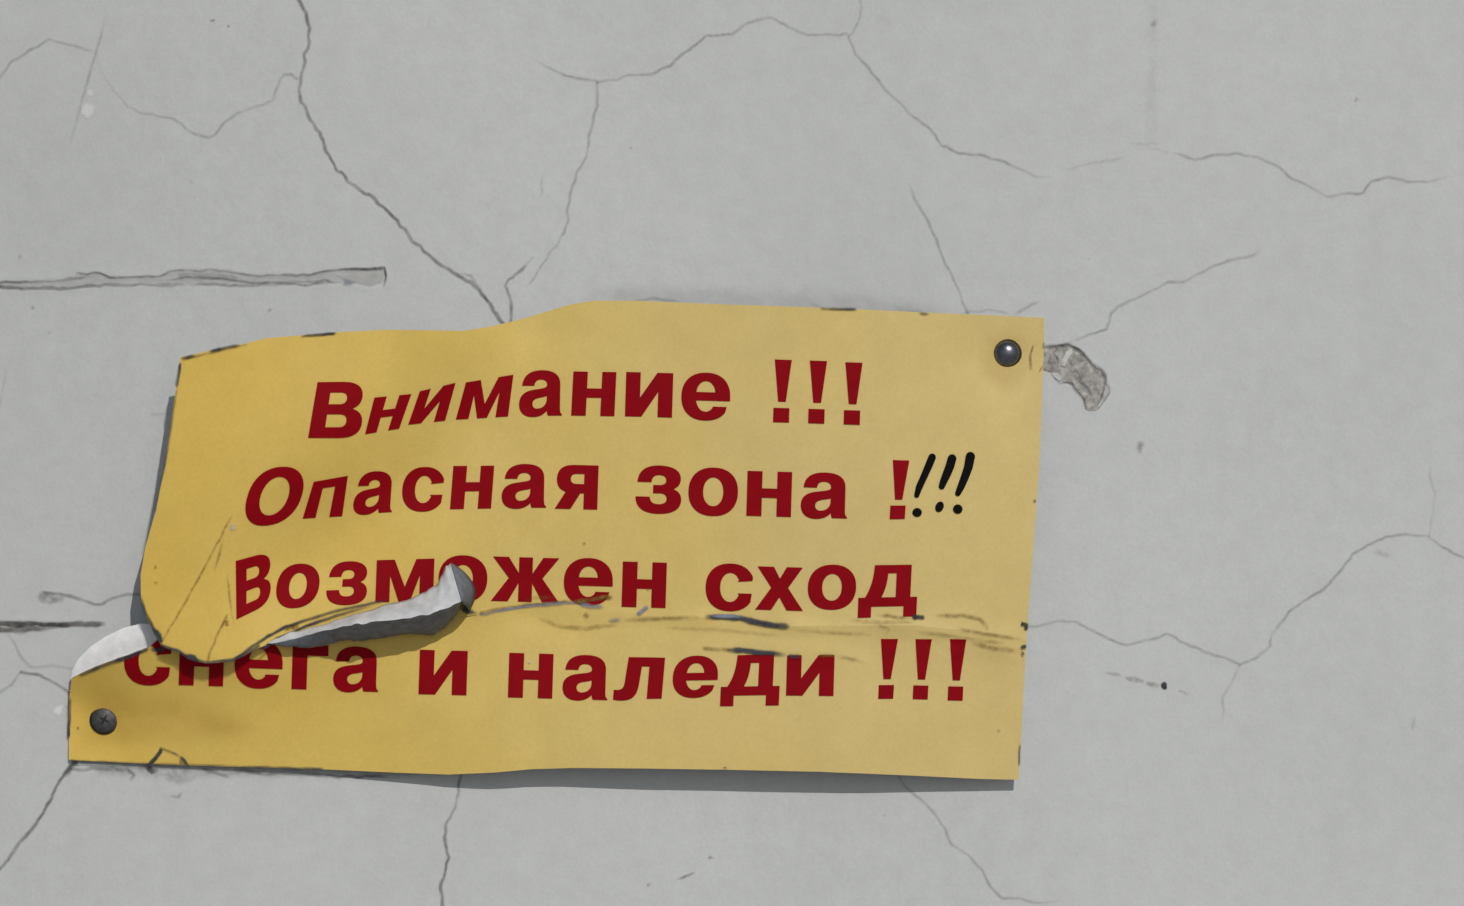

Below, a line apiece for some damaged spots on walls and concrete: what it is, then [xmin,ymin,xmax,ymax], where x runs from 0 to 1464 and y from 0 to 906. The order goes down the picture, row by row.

spalling [1043,344,1110,411]